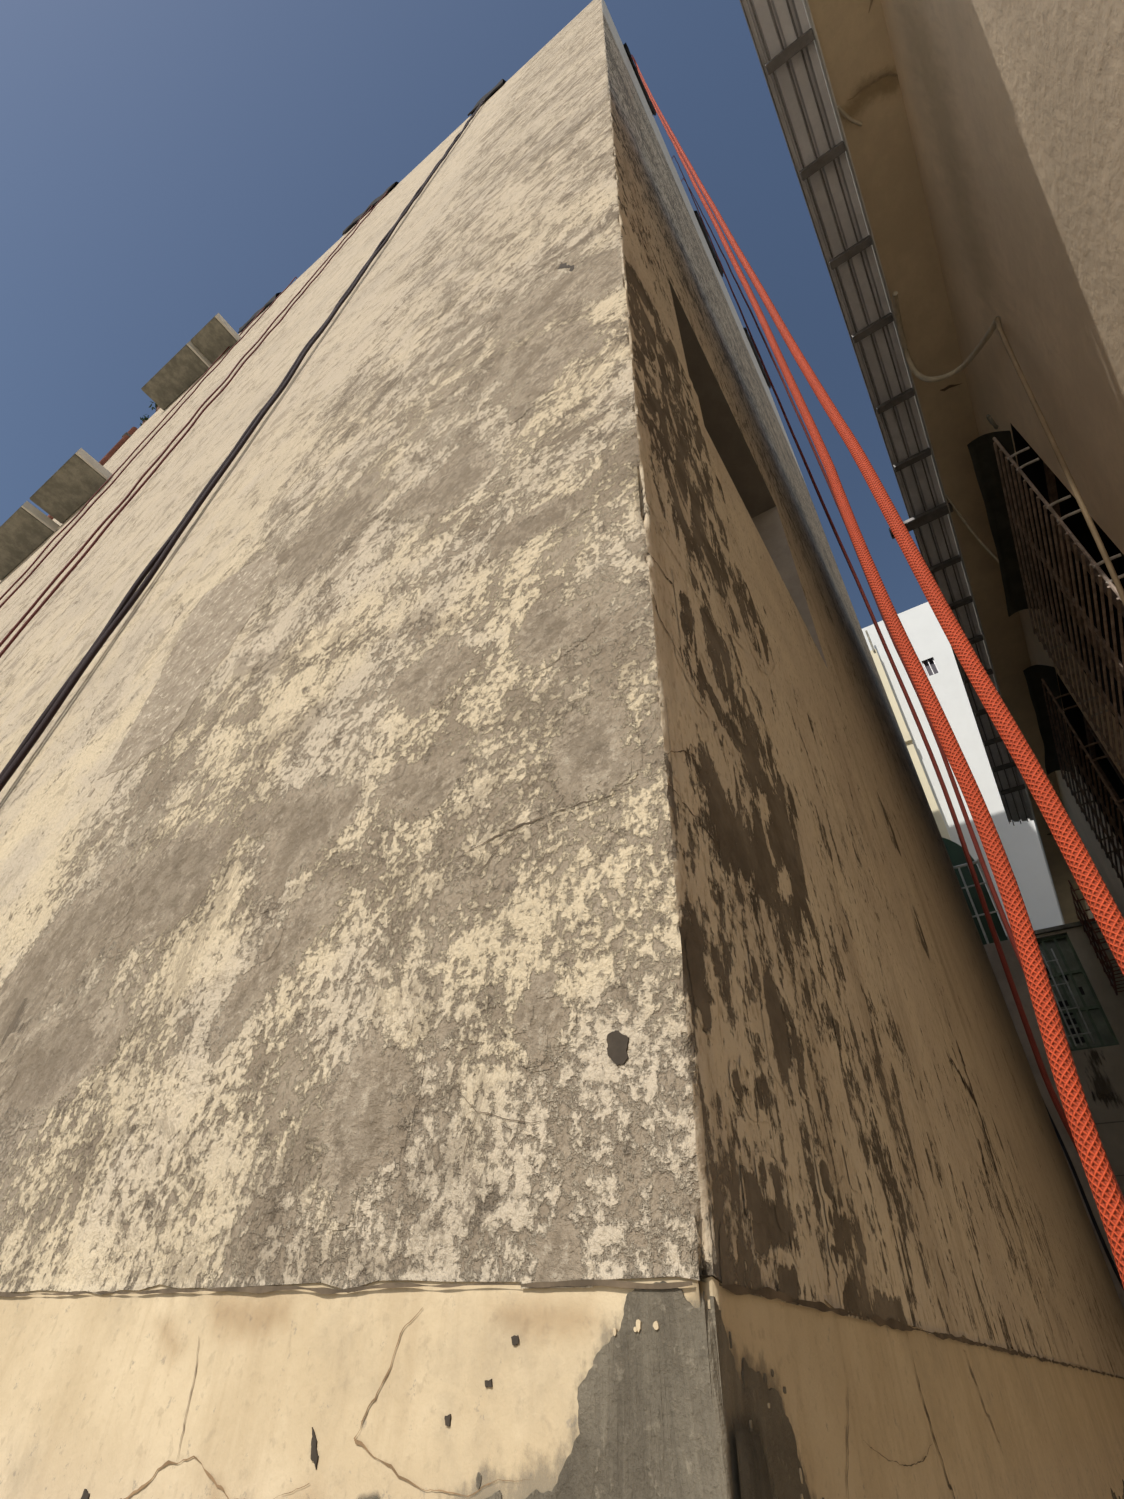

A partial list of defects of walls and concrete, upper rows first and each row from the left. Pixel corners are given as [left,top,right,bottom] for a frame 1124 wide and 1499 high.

crack [0,1279,1124,1499]